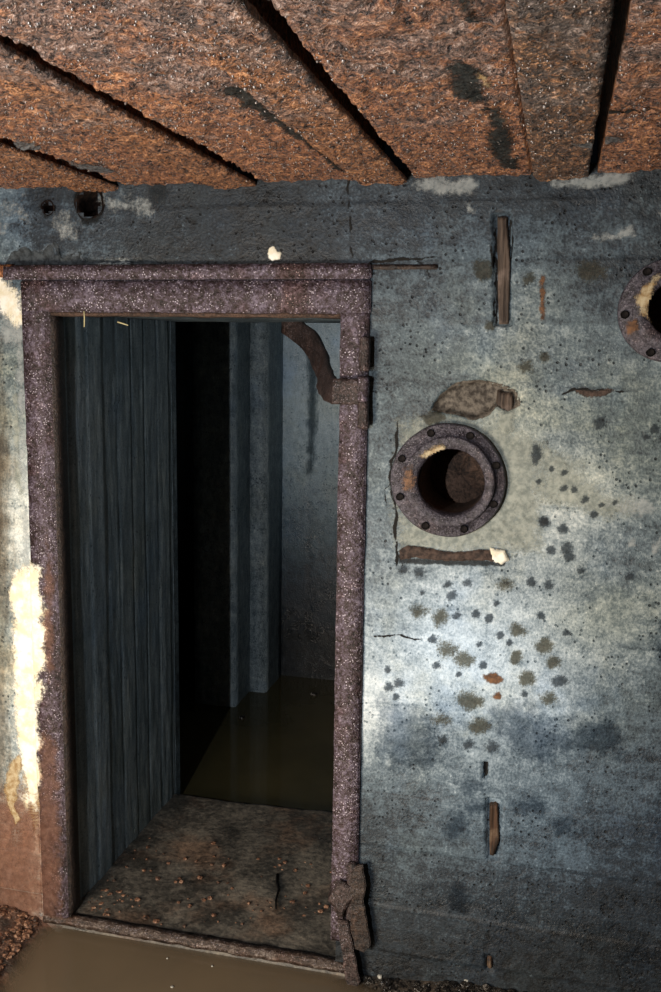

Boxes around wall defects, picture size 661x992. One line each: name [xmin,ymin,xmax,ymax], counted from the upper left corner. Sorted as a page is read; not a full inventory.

spalling [5,241,161,266]
peeling [0,277,22,328]
water stain [531,444,626,518]
water stain [398,565,426,578]
rust [399,545,509,567]
water stain [526,577,553,590]
water stain [538,515,585,574]
water stain [409,577,514,677]
peeling [8,561,49,831]
water stain [375,666,452,771]
water stain [457,622,621,762]